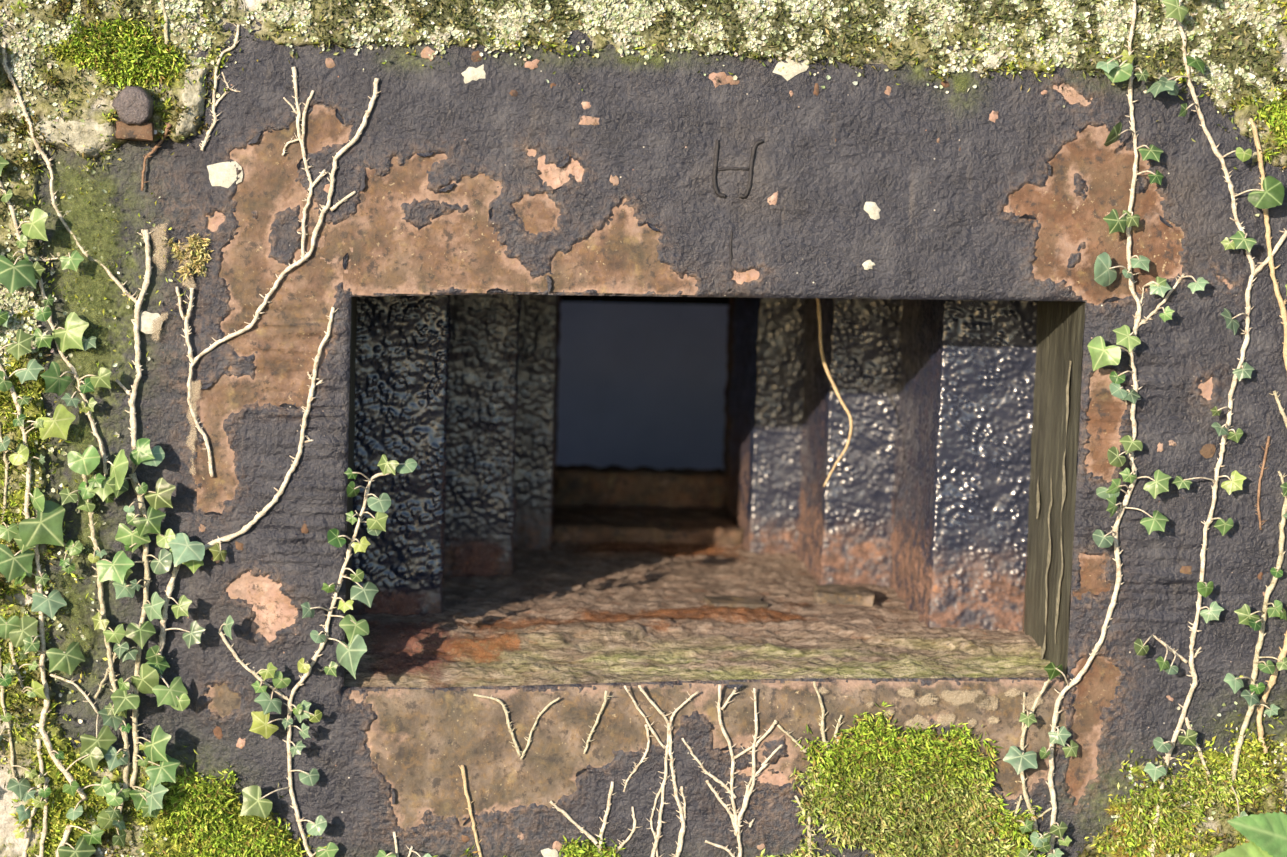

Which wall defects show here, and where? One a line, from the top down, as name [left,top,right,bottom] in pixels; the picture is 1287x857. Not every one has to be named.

peeling [1041,83,1093,106]
peeling [1003,124,1184,305]
peeling [191,102,698,532]
corrosion [575,539,736,556]
peeling [226,570,298,642]
corrosion [363,584,876,688]
peeling [349,656,1121,842]